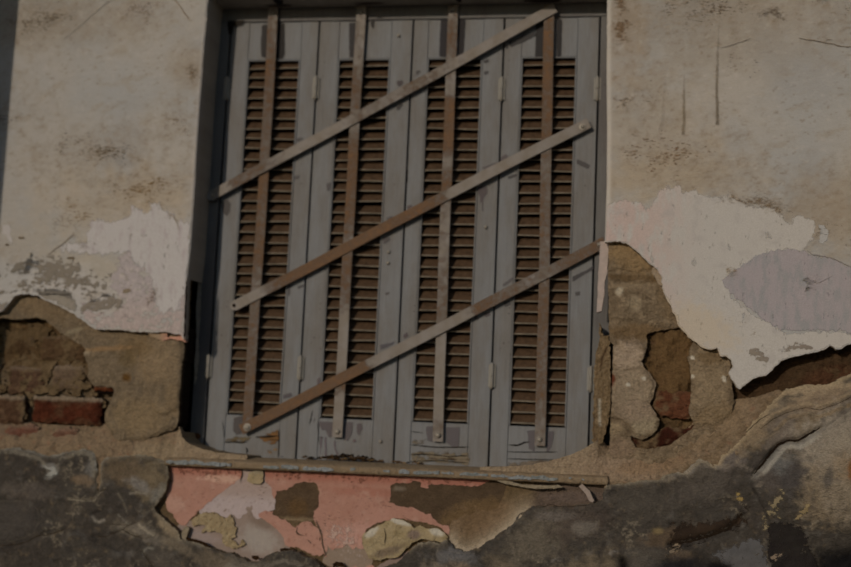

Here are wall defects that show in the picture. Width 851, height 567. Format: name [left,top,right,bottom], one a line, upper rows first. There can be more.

spalling [0,201,195,441]
peeling [592,185,851,464]
peeling [166,459,231,467]
peeling [178,465,334,561]
spalling [322,469,562,567]